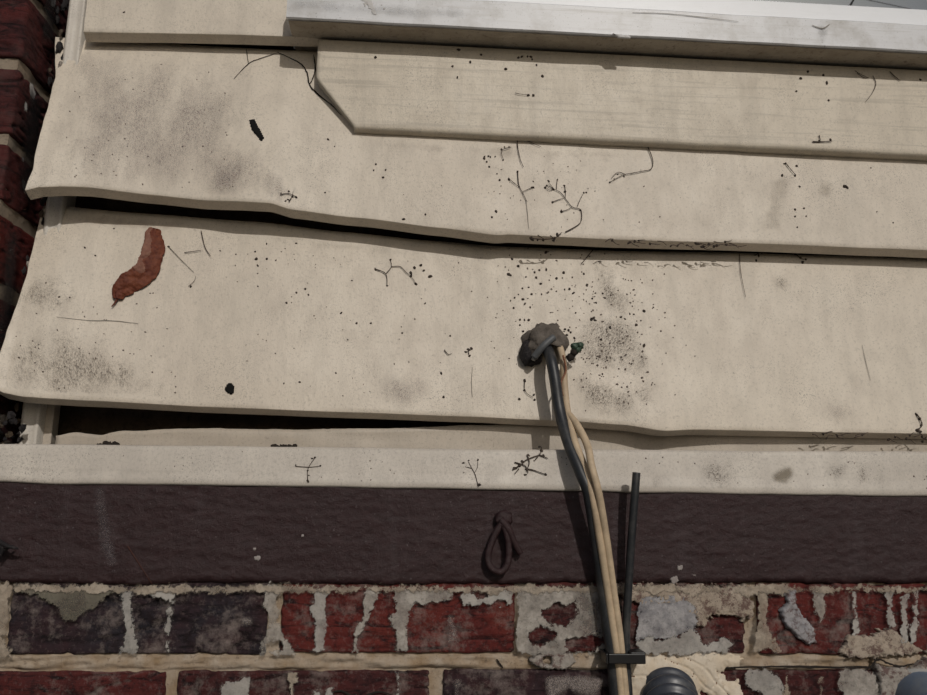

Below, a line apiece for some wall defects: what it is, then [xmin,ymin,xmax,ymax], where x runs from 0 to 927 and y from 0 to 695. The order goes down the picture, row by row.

damp [14,582,597,596]
damp [617,583,795,598]
damp [815,583,927,644]
damp [636,629,734,657]
damp [548,676,600,695]